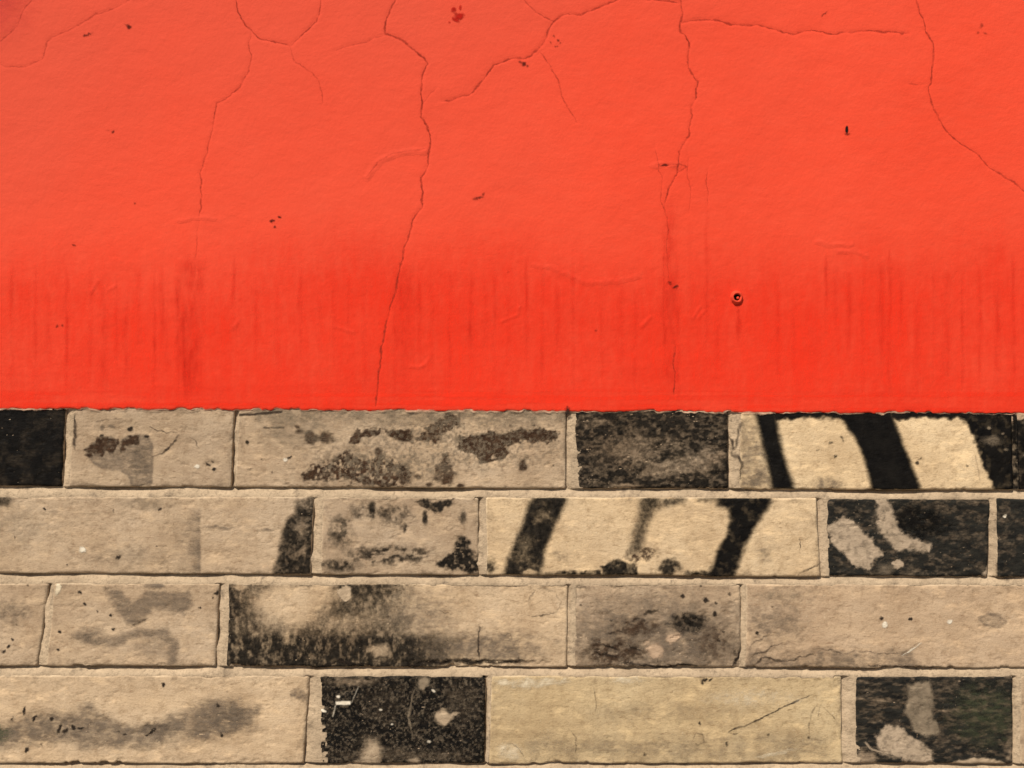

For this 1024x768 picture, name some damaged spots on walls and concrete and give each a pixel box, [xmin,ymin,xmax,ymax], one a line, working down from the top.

damp [0,278,1024,486]
damp [576,600,726,666]